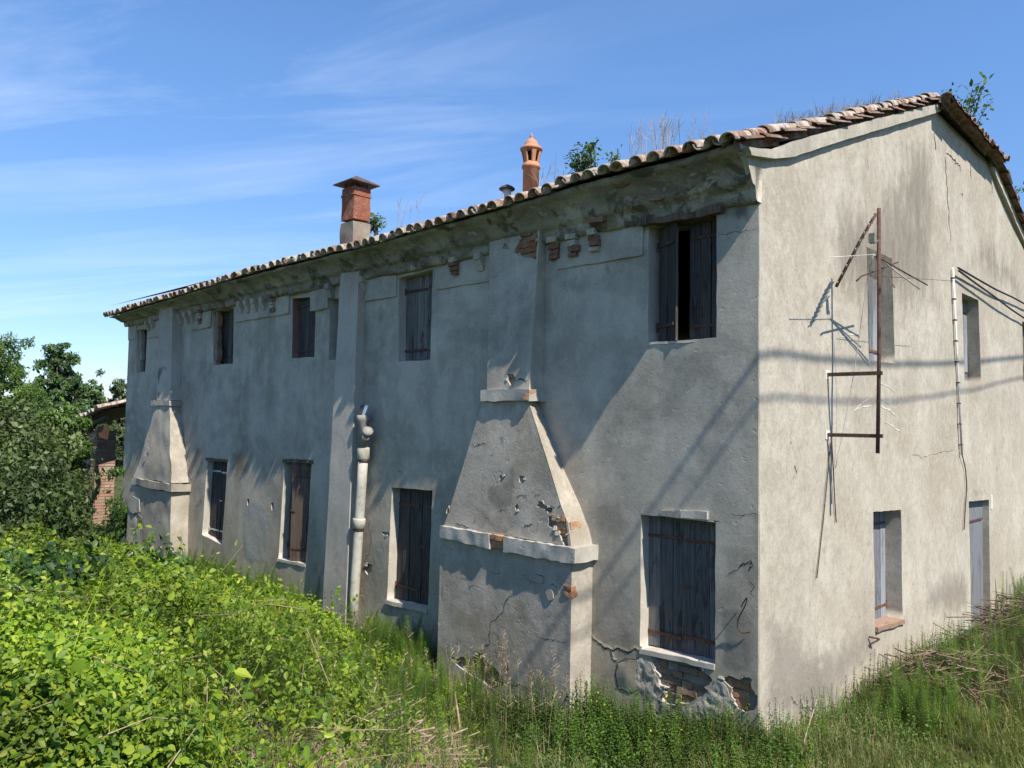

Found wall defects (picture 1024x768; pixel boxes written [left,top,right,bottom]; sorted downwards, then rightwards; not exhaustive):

crack [934,136,971,233]
spalling [503,232,540,259]
spalling [538,500,581,545]
crack [484,575,558,657]
crack [592,635,643,695]
spalling [636,657,758,721]